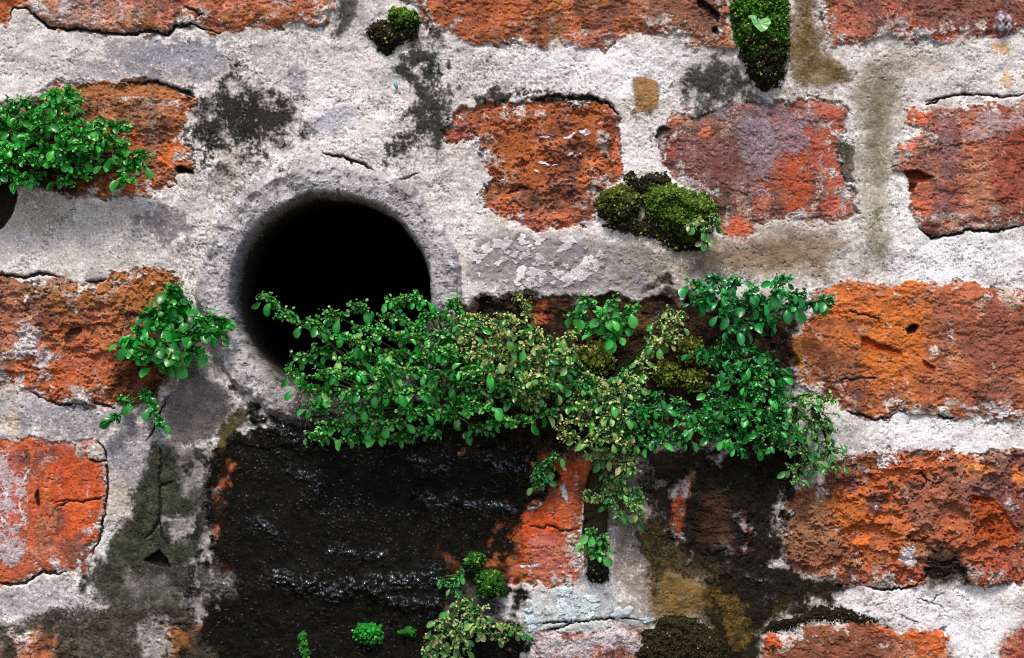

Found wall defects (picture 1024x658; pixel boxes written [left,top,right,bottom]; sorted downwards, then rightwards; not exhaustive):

water stain [184,60,318,176]
water stain [383,21,461,167]
spalling [656,126,671,138]
crack [926,93,1024,105]
water stain [79,557,106,594]
water stain [100,358,643,658]
water stain [632,434,856,658]